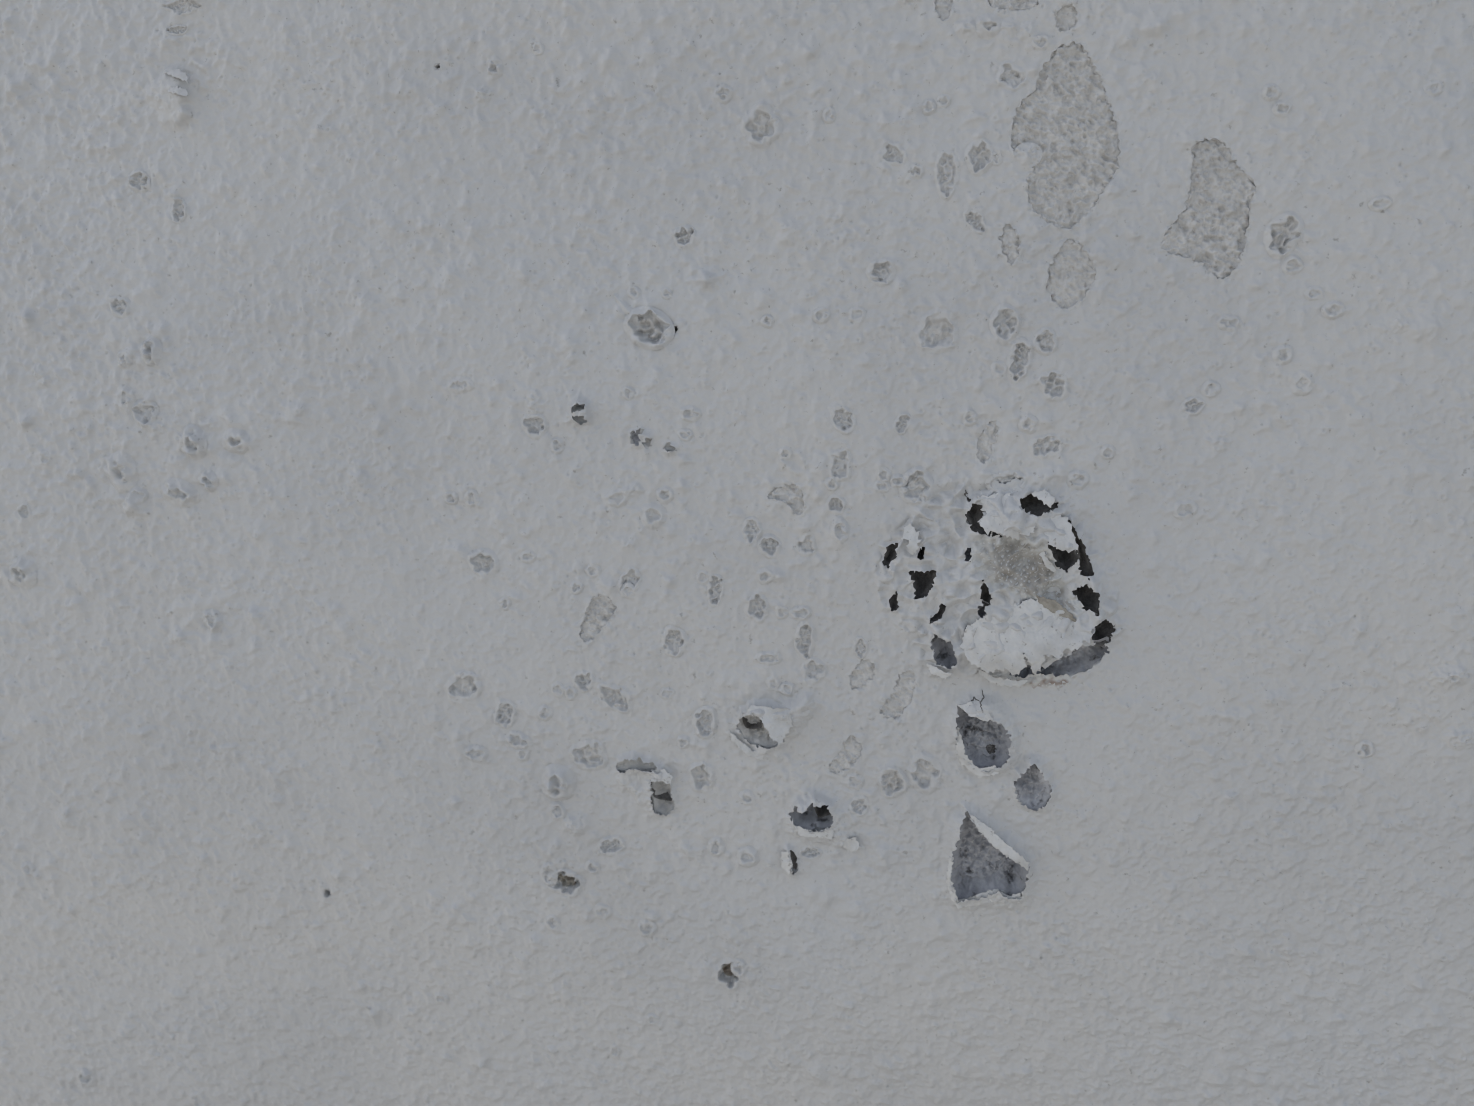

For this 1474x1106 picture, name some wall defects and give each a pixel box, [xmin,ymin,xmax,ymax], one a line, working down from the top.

peeling [880,0,1123,312]
peeling [1156,136,1304,281]
spalling [913,307,959,354]
spalling [989,303,1070,402]
peeling [962,409,1028,491]
spalling [1028,433,1065,460]